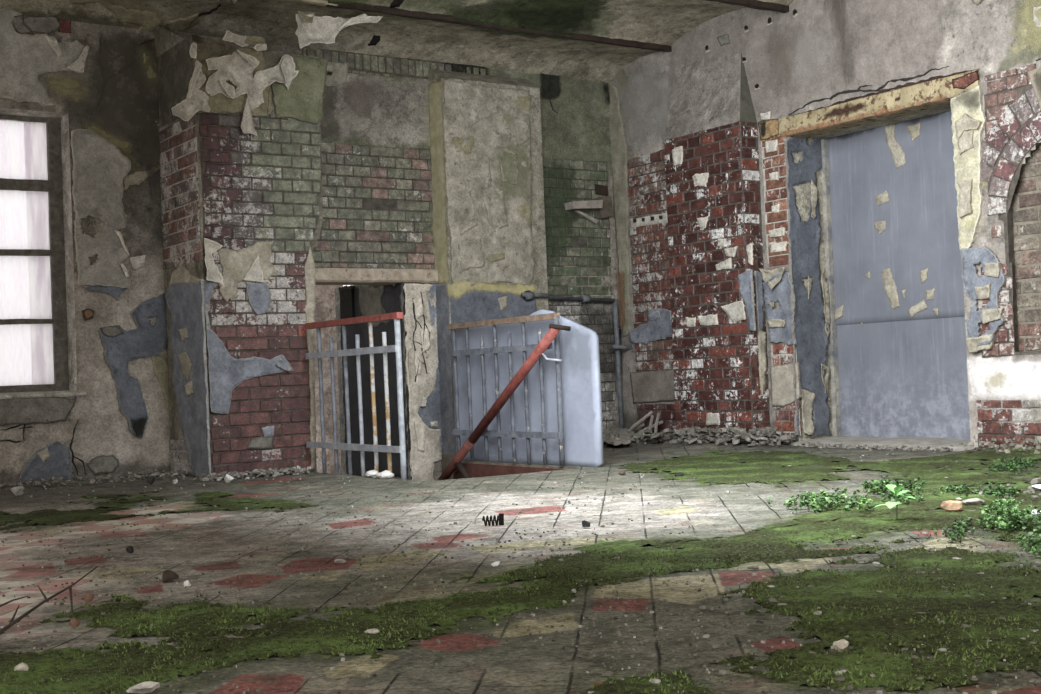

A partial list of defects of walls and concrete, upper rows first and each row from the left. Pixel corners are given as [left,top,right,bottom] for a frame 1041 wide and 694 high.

peeling [70,129,161,301]
peeling [171,11,383,136]
flaking render [608,81,672,344]
peeling [671,146,683,166]
peeling [685,85,1006,438]
corrosion [758,69,979,140]
crack [789,66,949,115]
peeling [98,238,293,478]
crack [403,284,430,480]